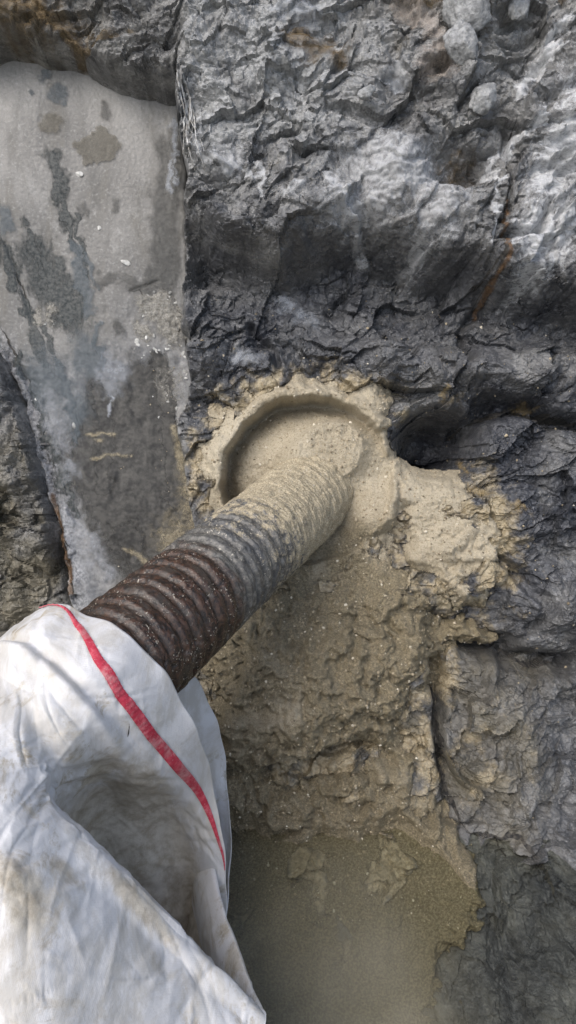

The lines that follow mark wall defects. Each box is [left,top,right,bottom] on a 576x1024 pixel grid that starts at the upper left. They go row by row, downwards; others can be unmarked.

leakage [39,69,67,132]
leakage [73,100,121,166]
leakage [130,116,267,293]
leakage [0,149,194,580]
crack [429,667,559,905]